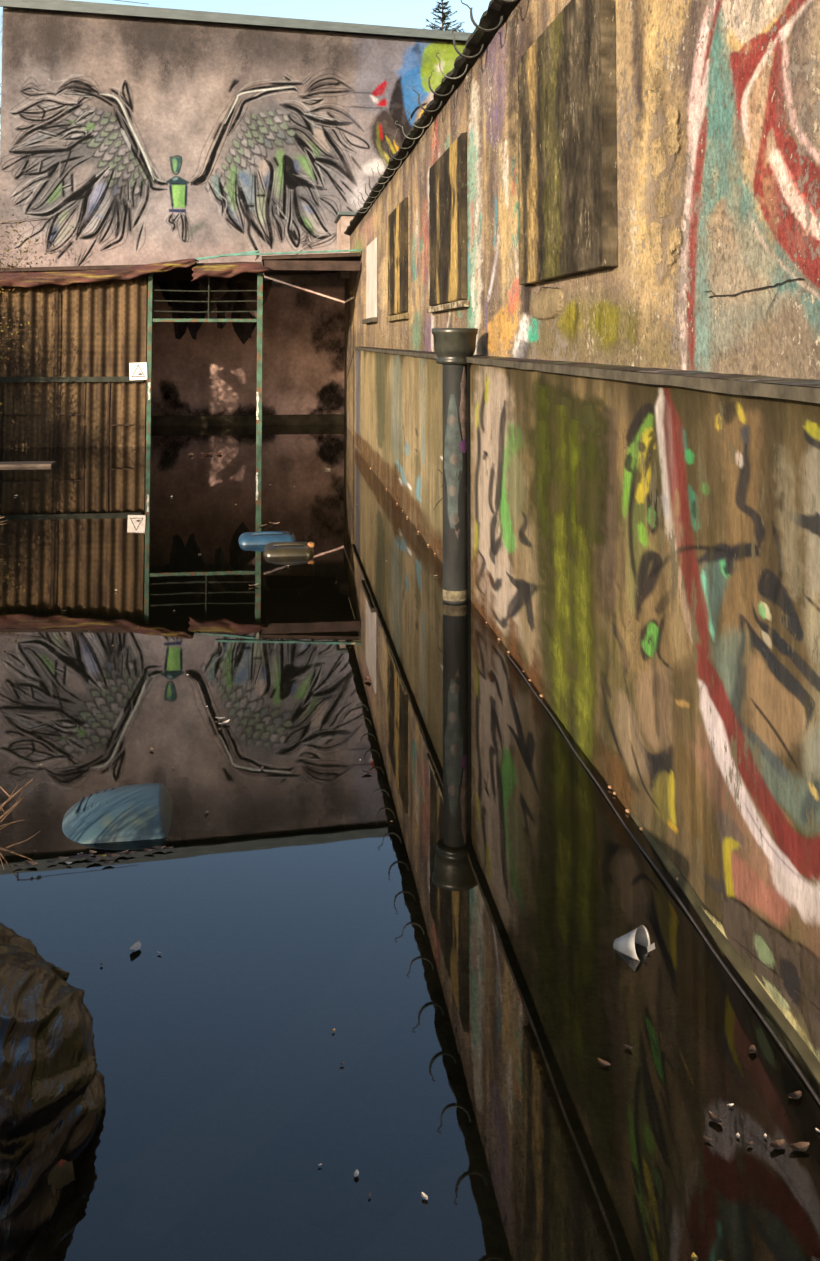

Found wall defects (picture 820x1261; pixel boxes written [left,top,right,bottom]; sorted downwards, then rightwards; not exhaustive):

water stain [539,386,595,755]